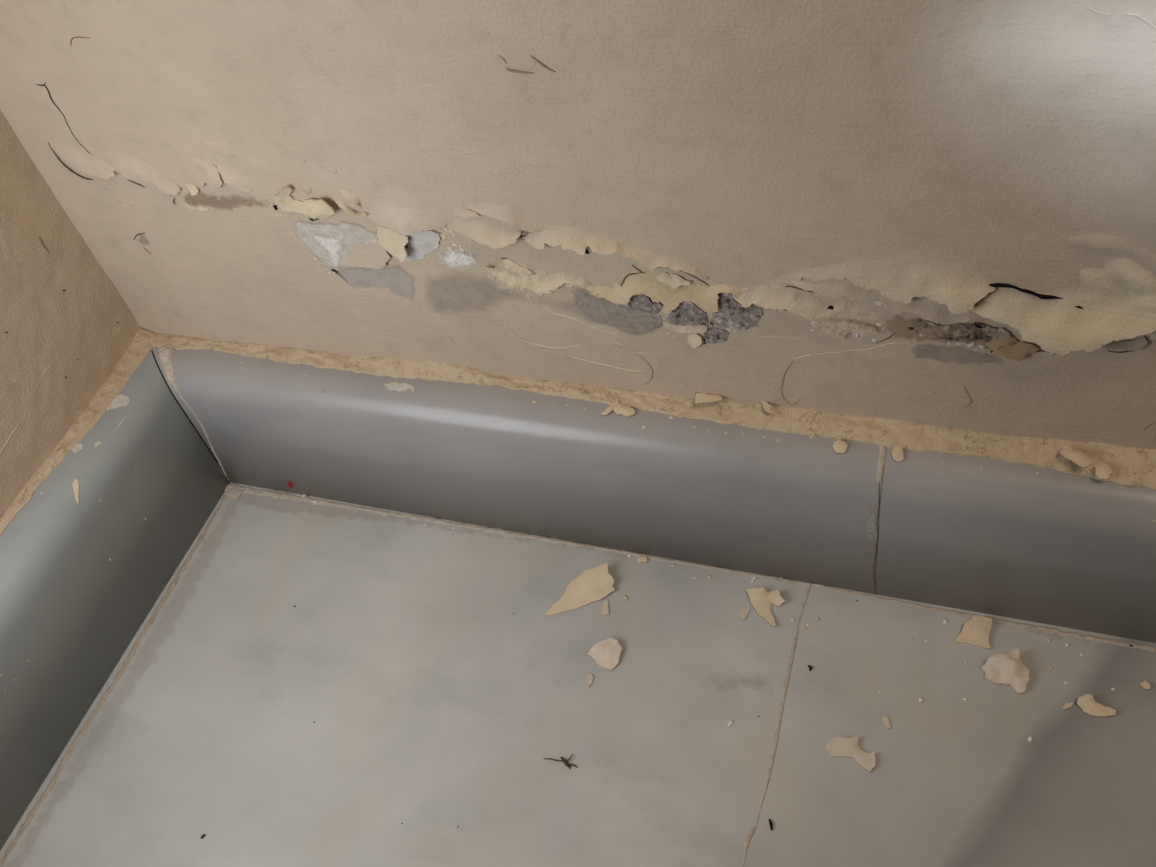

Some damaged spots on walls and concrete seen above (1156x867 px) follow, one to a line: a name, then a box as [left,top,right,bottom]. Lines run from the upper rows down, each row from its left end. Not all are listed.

peeling [46,140,1156,361]
crack [872,485,880,594]